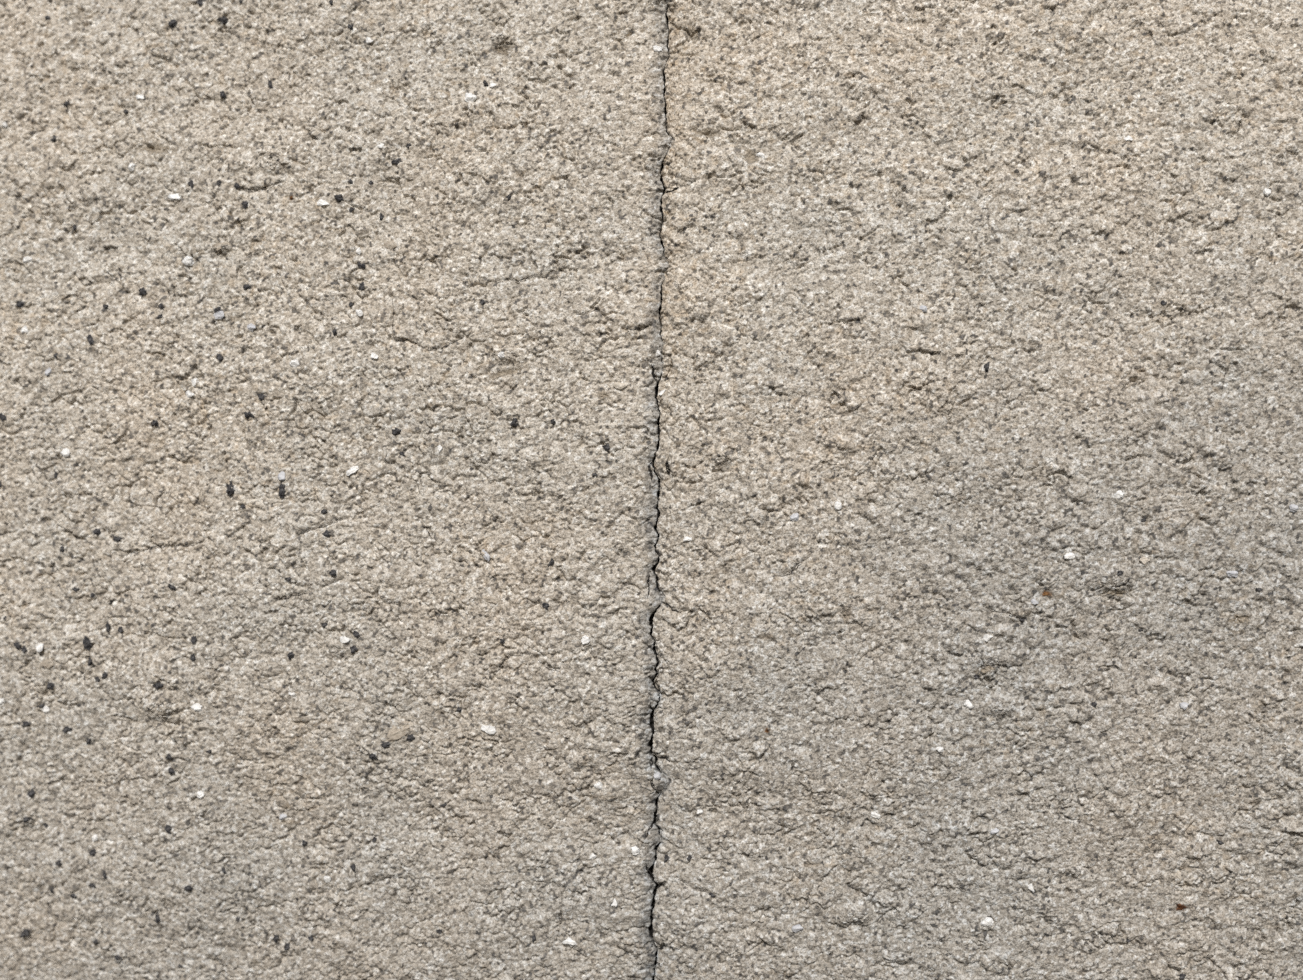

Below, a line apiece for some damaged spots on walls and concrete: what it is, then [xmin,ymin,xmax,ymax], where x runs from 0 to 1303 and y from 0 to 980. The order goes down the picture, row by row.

crack [660,6,678,254]
crack [631,286,710,980]